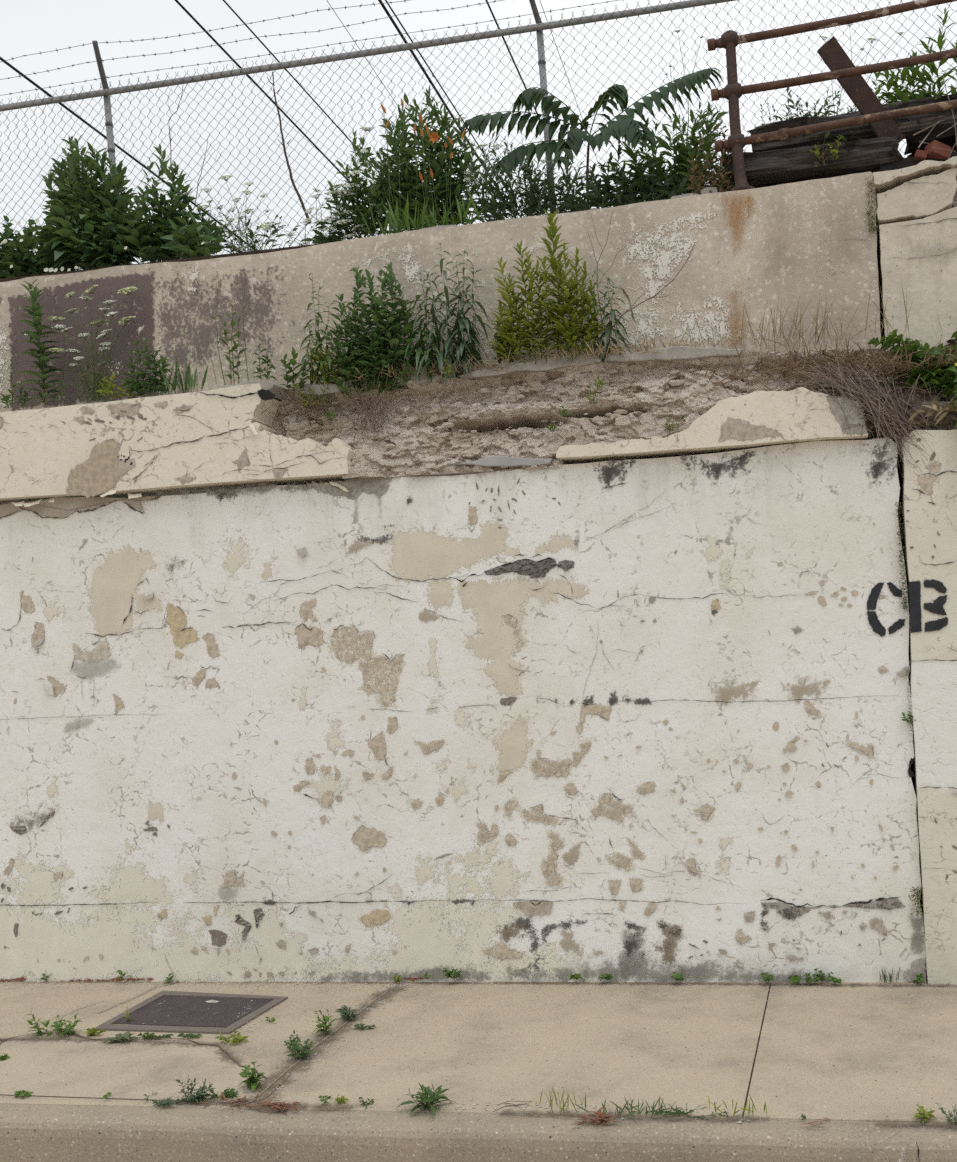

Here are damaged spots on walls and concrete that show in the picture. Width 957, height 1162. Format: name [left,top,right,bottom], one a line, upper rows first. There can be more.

peeling [0,402,157,519]
peeling [20,590,64,648]
peeling [72,544,220,689]
spalling [257,348,921,828]
crack [693,668,863,702]
crack [5,900,146,908]
peeling [0,776,612,982]
crack [241,874,436,914]
crack [472,819,738,915]
peeling [597,839,657,916]
water stain [496,917,830,982]
spalling [688,896,906,959]